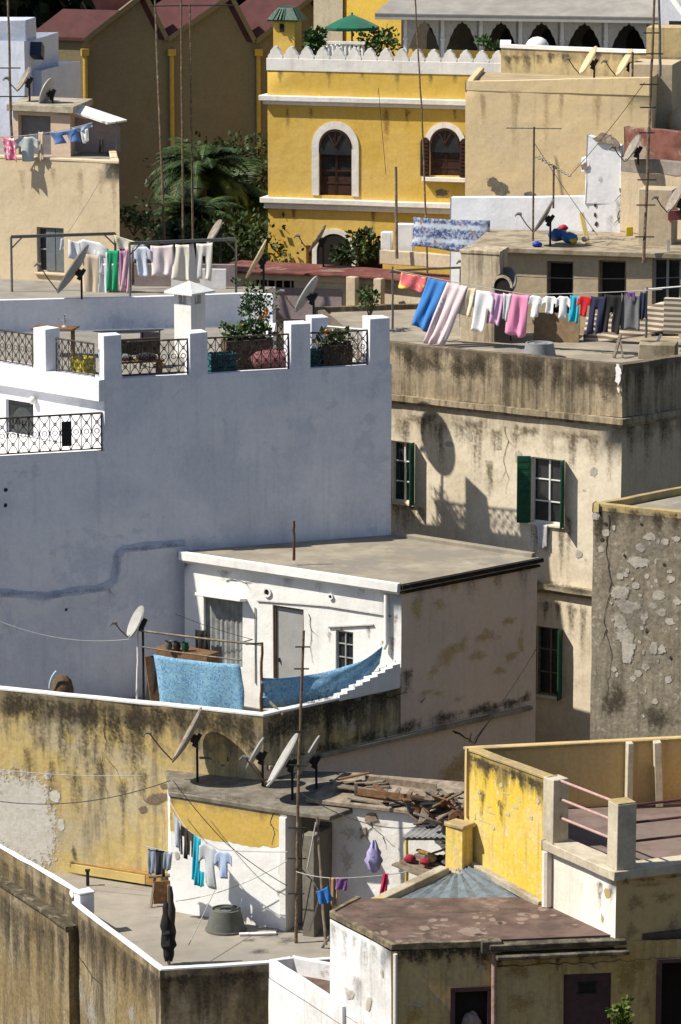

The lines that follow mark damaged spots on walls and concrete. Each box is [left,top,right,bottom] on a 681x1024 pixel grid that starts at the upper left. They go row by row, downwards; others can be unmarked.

leakage [451,353,663,395]
spalling [592,512,615,552]
leakage [595,508,617,536]
crack [599,514,614,697]
spalling [610,523,681,705]
flaking render [0,761,65,868]
leakage [3,671,413,799]
leakage [470,694,529,716]
leakage [470,756,542,805]
leakage [602,685,625,713]
leakage [0,897,63,988]
leakage [71,914,254,1007]